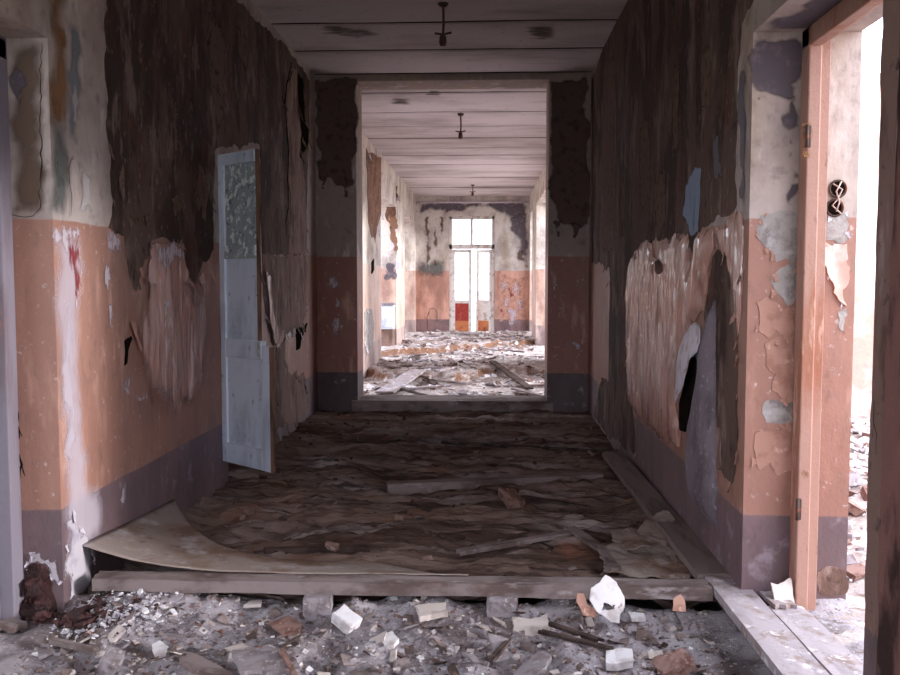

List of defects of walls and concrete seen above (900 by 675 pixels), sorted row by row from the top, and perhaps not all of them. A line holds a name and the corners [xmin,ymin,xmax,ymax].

leakage [69,240,80,296]
flaking render [104,0,313,350]
flaking render [366,148,401,270]
flaking render [590,0,754,493]
peeling [825,211,852,331]
leakage [63,324,73,408]
flaking render [752,210,798,476]
flaking render [18,510,96,621]